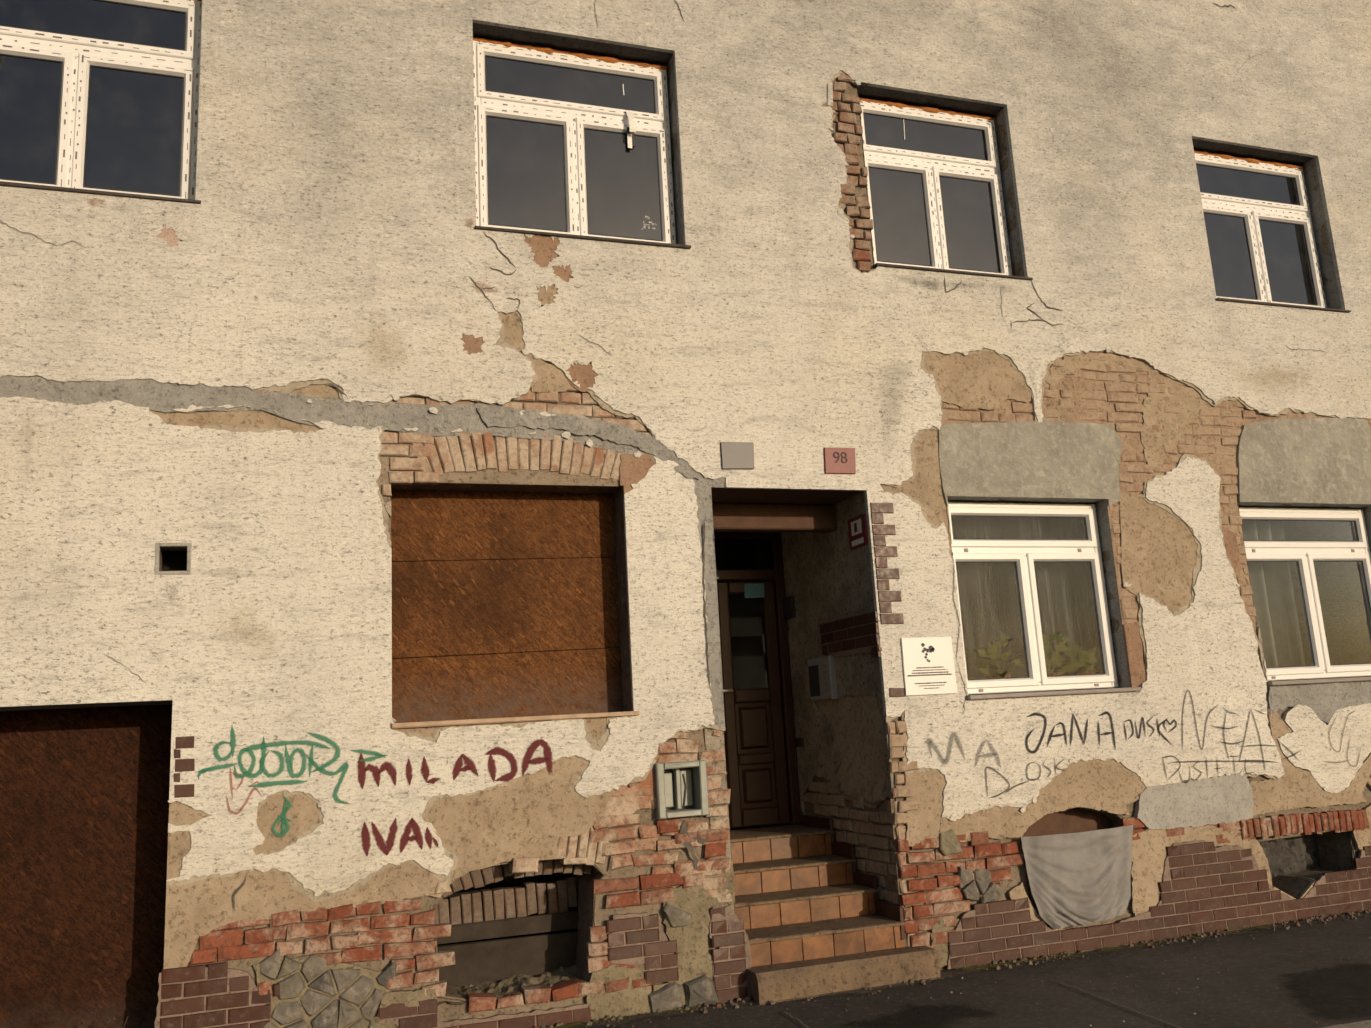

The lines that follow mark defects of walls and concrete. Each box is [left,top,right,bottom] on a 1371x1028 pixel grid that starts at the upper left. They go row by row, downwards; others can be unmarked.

flaking render [822,71,876,273]
flaking render [524,234,572,305]
crack [1000,280,1063,328]
flaking render [149,379,344,436]
flaking render [376,311,655,548]
flaking render [880,347,1371,693]
flaking render [166,799,212,887]
flaking render [253,789,324,870]
flaking render [557,722,732,908]
flaking render [803,721,1024,956]
flaking render [1166,809,1369,843]
flaking render [190,890,455,997]